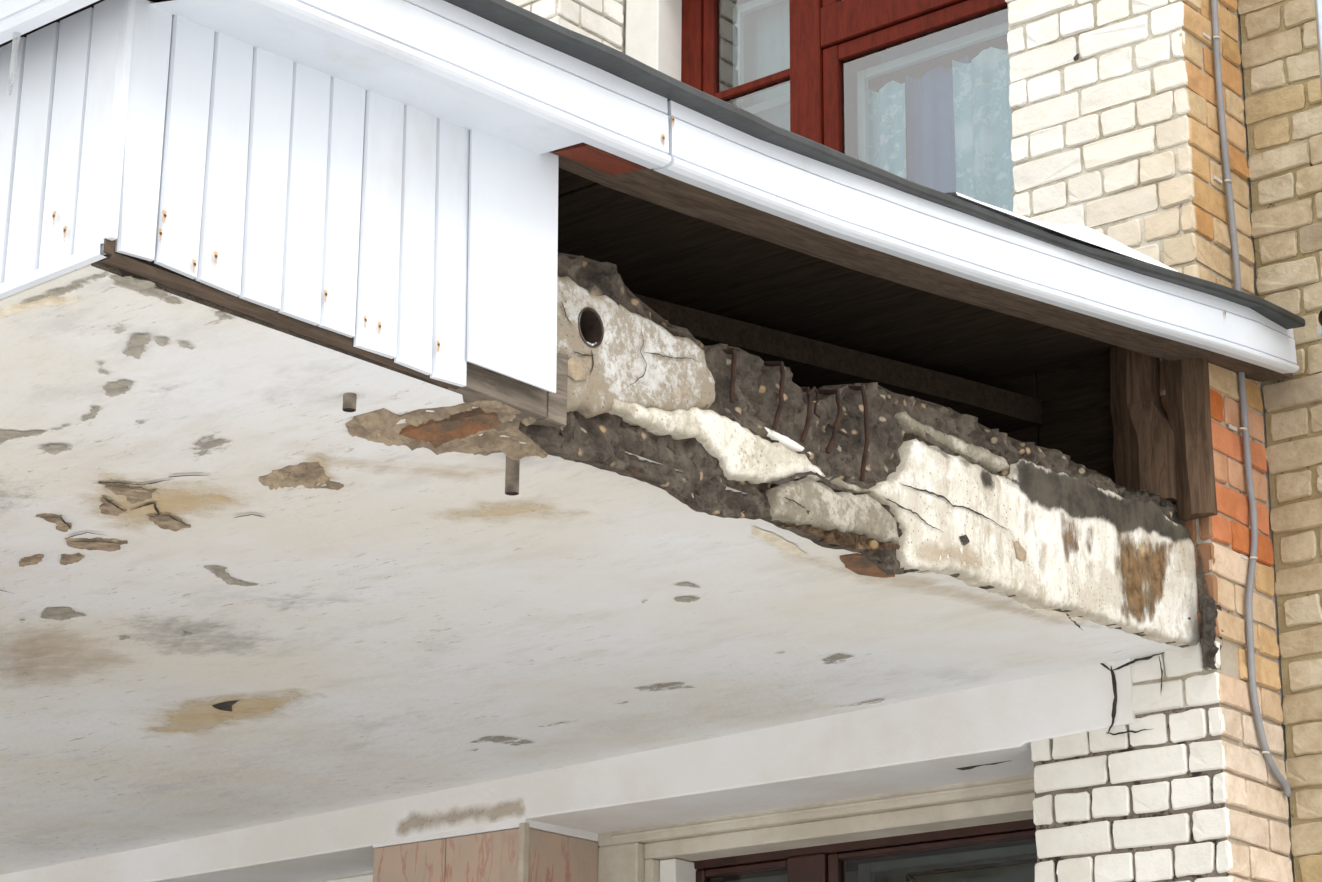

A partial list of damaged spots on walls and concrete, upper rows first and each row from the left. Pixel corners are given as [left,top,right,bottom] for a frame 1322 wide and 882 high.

peeling [0,362,134,455]
crack [629,329,699,386]
spalling [557,255,1186,529]
peeling [36,513,128,565]
peeling [98,481,191,532]
spalling [259,462,344,490]
spalling [346,400,979,578]
rust [1116,531,1172,622]
spalling [1166,543,1224,670]
damp [157,697,289,731]
crack [1100,652,1165,735]
damp [400,804,521,832]